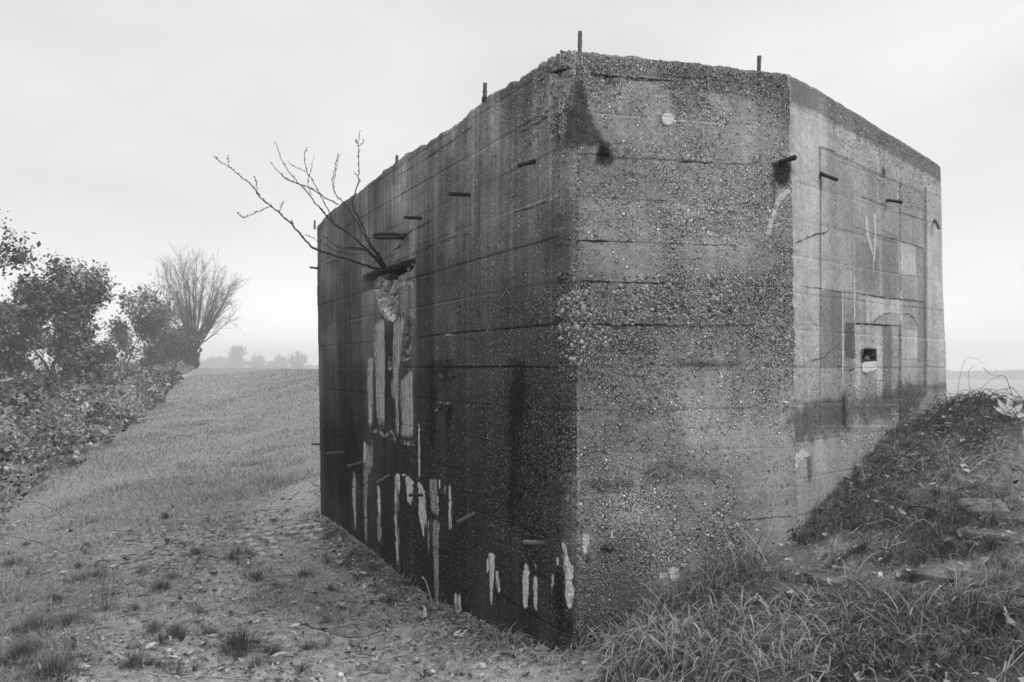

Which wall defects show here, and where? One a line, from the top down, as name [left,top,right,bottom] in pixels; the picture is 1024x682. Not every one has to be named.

damp [568,82,605,145]
peeling [364,263,416,446]